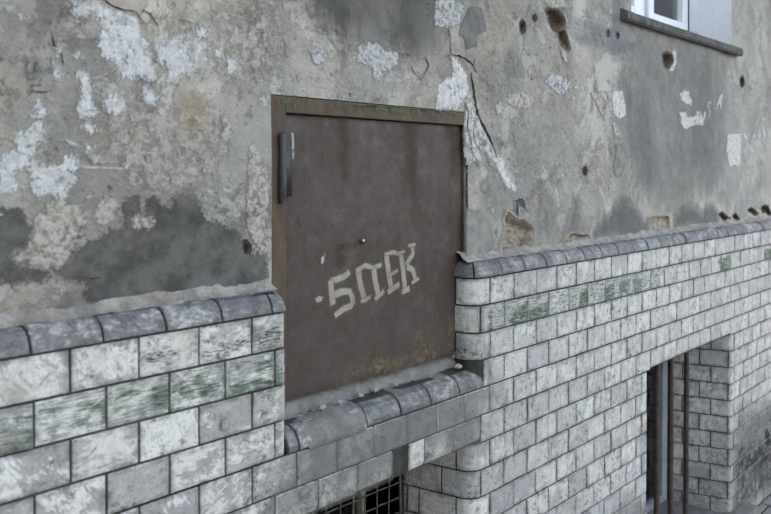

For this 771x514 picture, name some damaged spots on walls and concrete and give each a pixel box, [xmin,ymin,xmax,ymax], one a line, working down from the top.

flaking render [545,0,568,26]
flaking render [357,42,399,80]
flaking render [545,73,580,95]
crack [349,105,447,113]
crack [404,29,498,197]
flaking render [590,90,626,139]
peeling [679,90,705,129]
flaking render [0,0,285,269]
spalling [374,57,536,252]
peeling [726,132,741,167]
peeling [718,204,771,221]
damp [0,194,270,305]